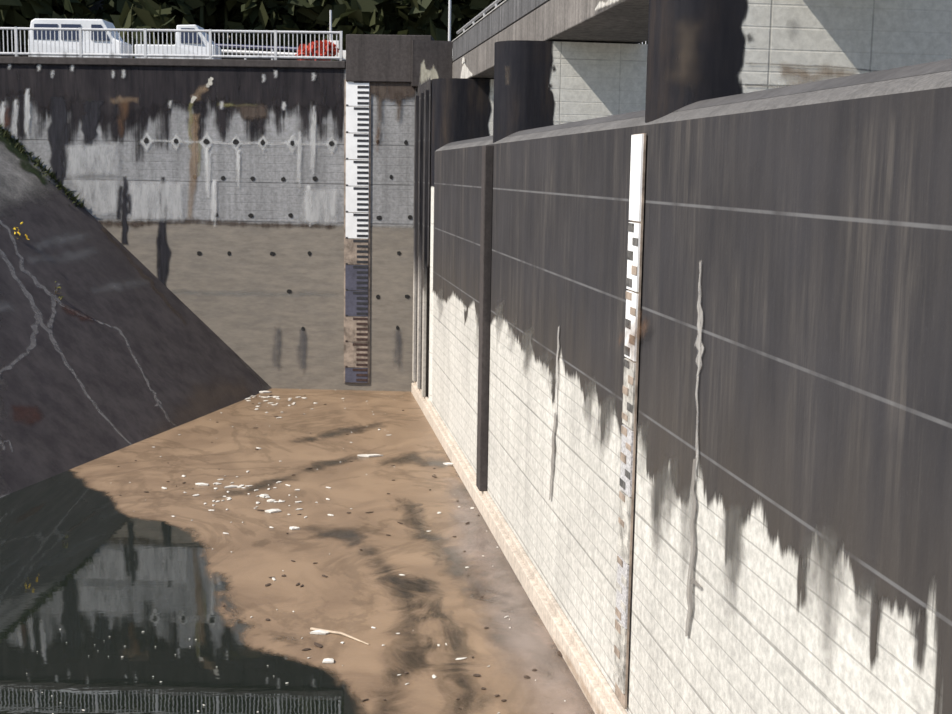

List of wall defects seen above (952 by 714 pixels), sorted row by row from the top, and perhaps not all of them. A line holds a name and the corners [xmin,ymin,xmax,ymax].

corrosion [189,105,199,210]
damp [0,54,414,392]
crack [0,220,177,445]
crack [696,277,704,407]
crack [685,430,701,636]